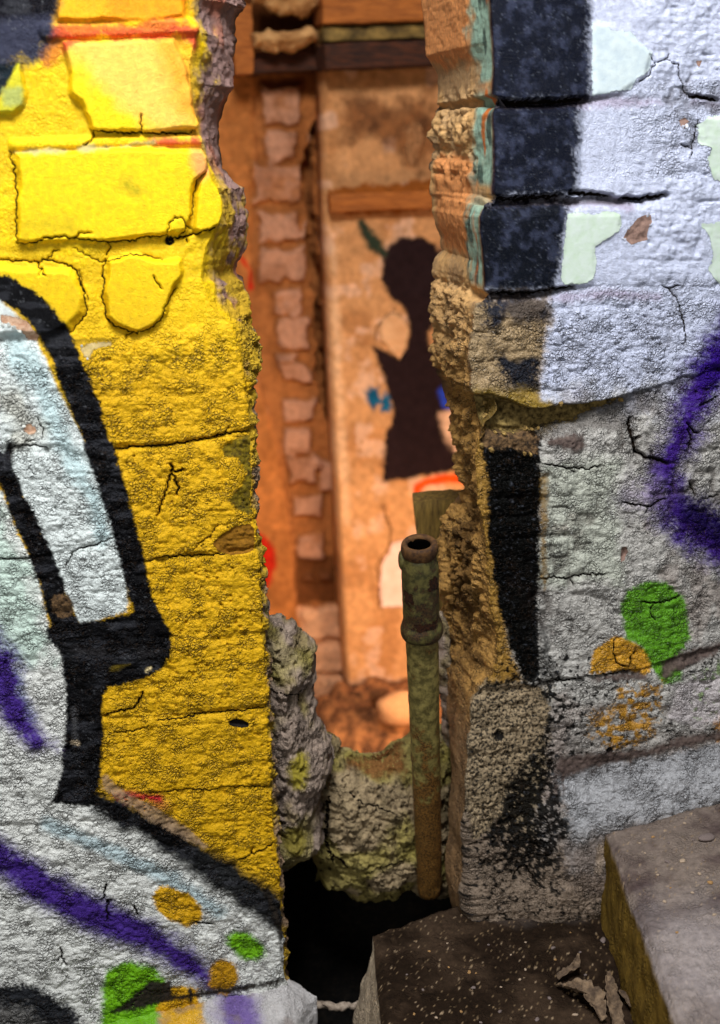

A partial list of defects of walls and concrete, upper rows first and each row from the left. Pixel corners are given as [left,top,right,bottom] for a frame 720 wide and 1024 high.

peeling [591,21,653,97]
crack [639,54,716,157]
peeling [680,115,720,181]
peeling [561,211,652,285]
crack [544,463,599,472]
crack [626,418,666,463]
crack [538,572,605,584]